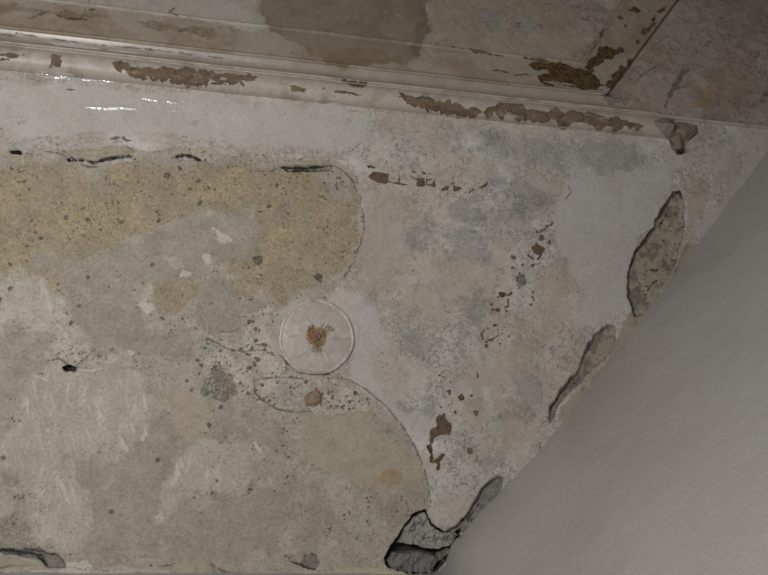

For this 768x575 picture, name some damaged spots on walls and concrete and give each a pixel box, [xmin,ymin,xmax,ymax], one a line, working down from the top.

peeling [618,6,667,44]
peeling [112,60,257,90]
peeling [493,29,632,90]
peeling [399,92,644,135]
crack [43,151,135,169]
crack [175,153,206,163]
spalling [549,190,697,423]
flaking render [0,136,488,574]
corrosion [306,323,334,353]
spalling [443,476,504,533]